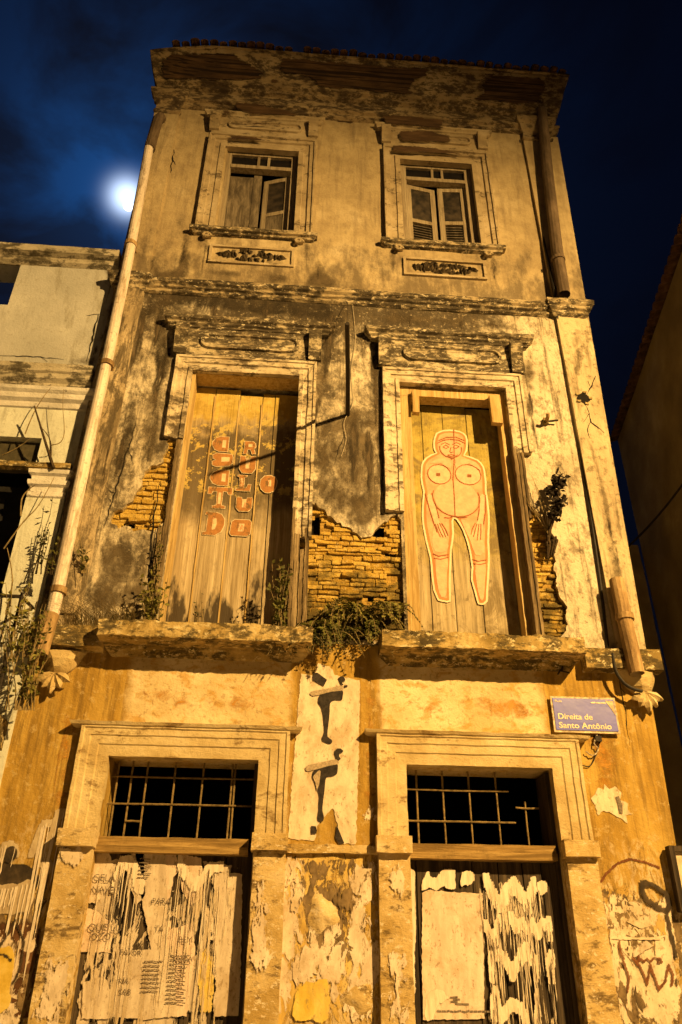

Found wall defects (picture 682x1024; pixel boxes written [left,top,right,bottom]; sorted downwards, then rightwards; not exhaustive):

damp [103,294,384,525]
crack [584,376,600,435]
flaking render [112,441,176,532]
damp [92,544,147,607]
flaking render [296,505,404,641]
flaking render [529,510,567,637]